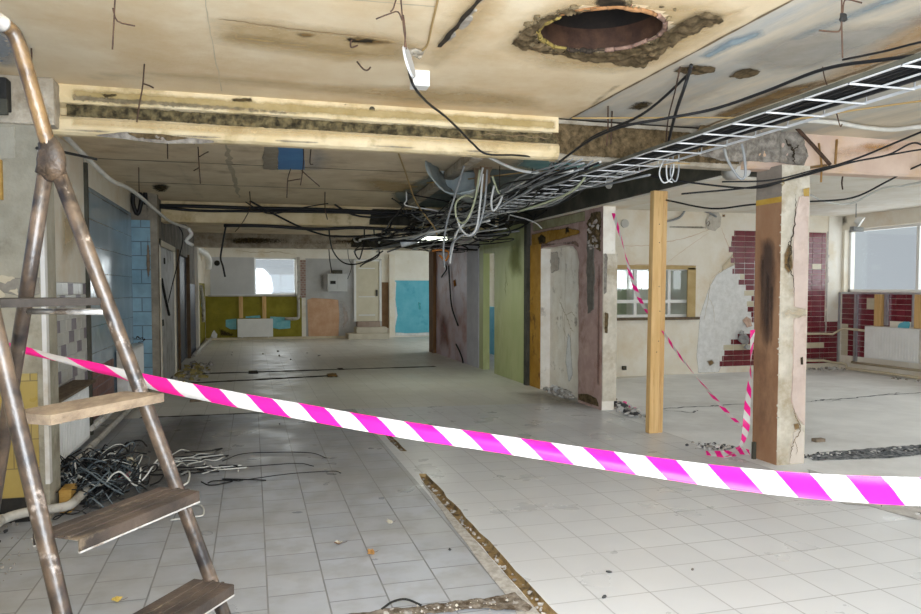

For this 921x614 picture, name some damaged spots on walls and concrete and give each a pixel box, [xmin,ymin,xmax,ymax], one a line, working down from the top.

spalling [512,8,724,69]
spalling [552,118,710,158]
spalling [665,129,832,166]
flaking render [697,261,755,373]